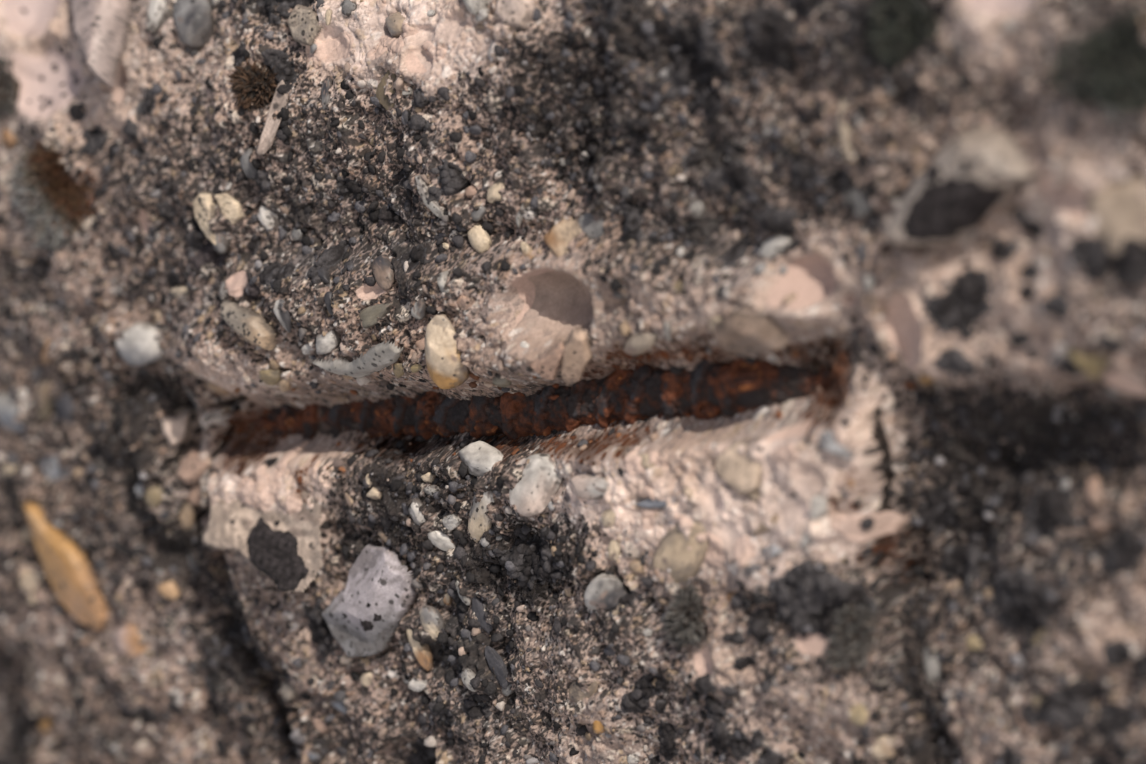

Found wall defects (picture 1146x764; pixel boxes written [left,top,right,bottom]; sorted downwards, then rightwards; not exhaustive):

spalling [508,265,631,370]
rust [582,337,851,436]
spalling [207,358,831,555]
rust [482,420,656,466]
spalling [550,408,910,592]